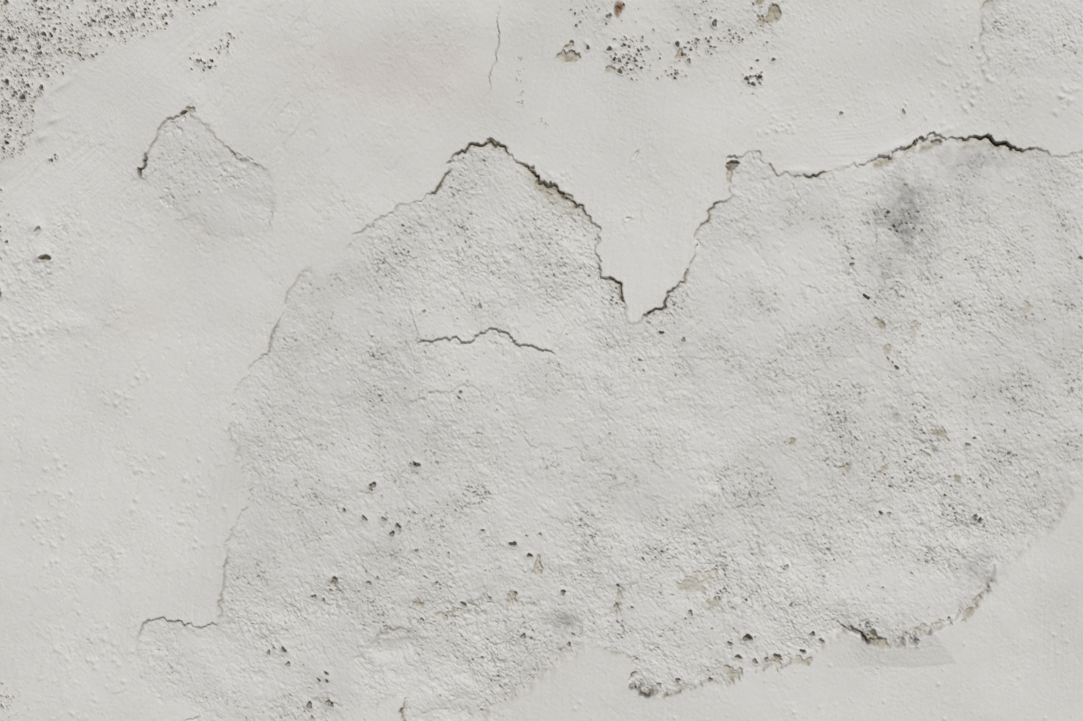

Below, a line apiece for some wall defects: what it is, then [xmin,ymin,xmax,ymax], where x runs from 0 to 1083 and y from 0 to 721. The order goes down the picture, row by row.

peeling [136,106,279,245]
flaking render [135,132,1083,721]